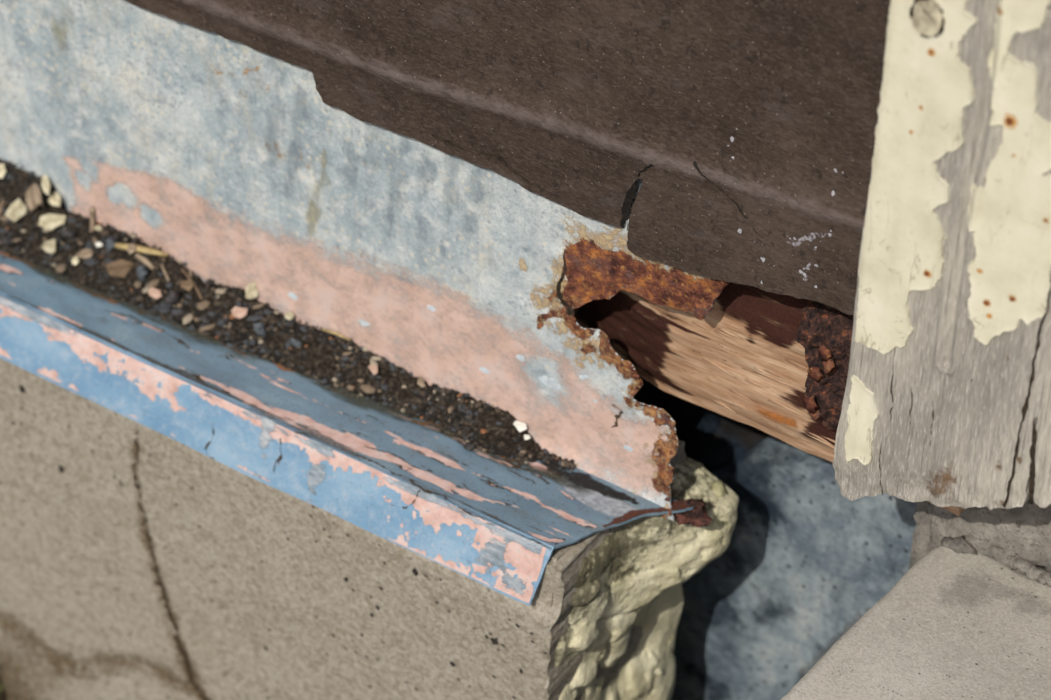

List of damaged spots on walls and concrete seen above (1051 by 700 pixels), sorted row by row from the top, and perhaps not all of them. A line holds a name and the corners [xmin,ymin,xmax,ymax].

peeling [0,264,24,286]
crack [131,431,208,700]
peeling [0,297,597,603]
peeling [37,157,677,502]
corrosion [529,217,729,531]
crack [620,164,655,228]
corrosion [807,345,835,382]
peeling [844,375,879,465]
peeling [855,0,978,354]
peeling [967,0,1051,345]
crack [1003,280,1051,508]